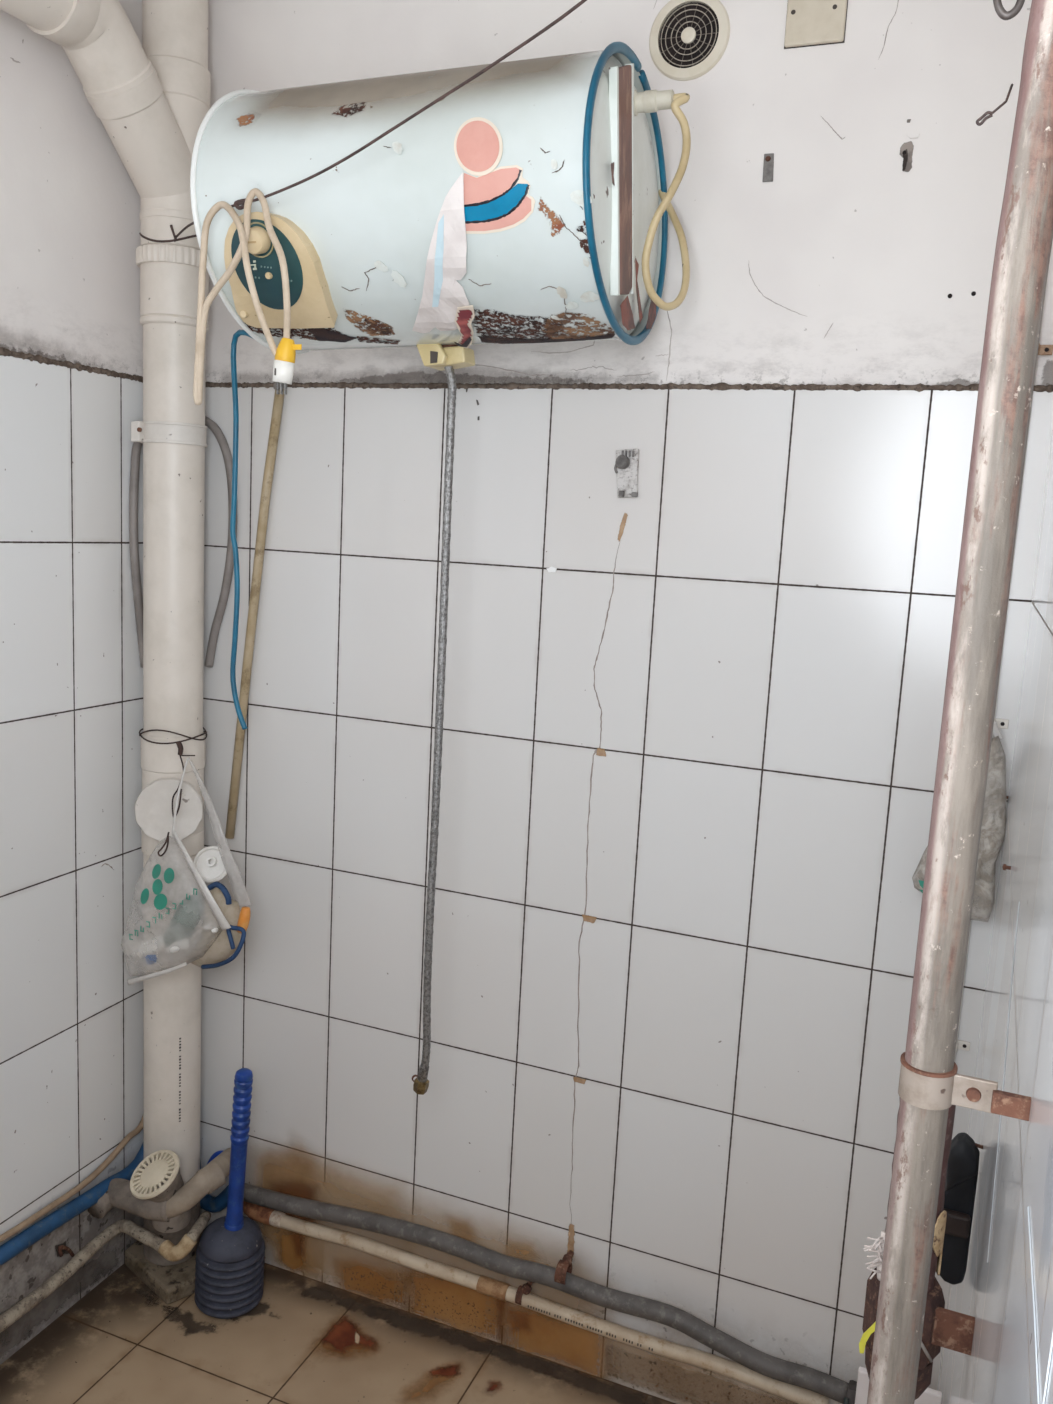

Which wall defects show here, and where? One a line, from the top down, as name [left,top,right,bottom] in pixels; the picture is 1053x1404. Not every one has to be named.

crack [878,0,899,60]
crack [567,513,628,1258]
corrosion [317,1317,376,1358]
corrosion [342,1264,601,1376]
corrosion [406,1365,459,1400]